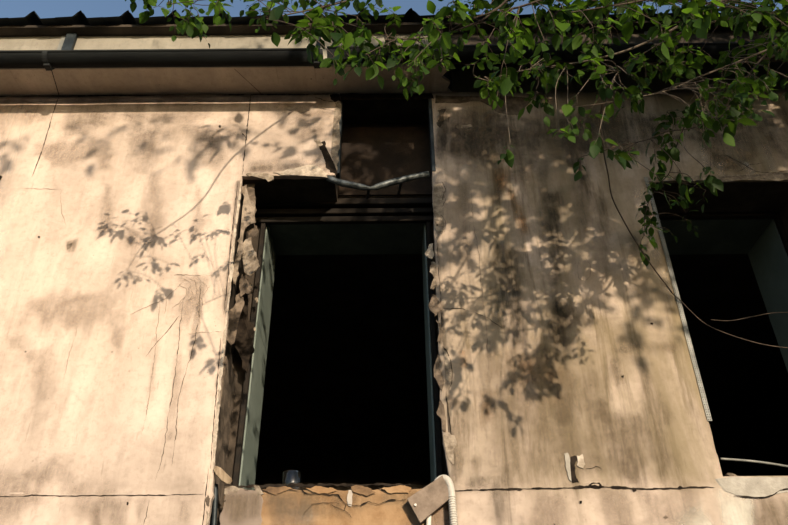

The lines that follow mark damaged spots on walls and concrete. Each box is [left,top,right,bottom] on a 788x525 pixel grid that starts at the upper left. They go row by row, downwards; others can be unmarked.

crack [24,72,154,220]
peeling [227,165,328,373]
crack [224,70,336,310]
spalling [331,101,342,169]
spalling [424,243,444,343]
water stain [547,194,561,280]
water stain [550,303,569,341]
crack [0,289,411,525]
spalling [433,355,457,465]
peeling [205,485,336,525]
spalling [347,485,411,507]
crack [455,466,715,491]